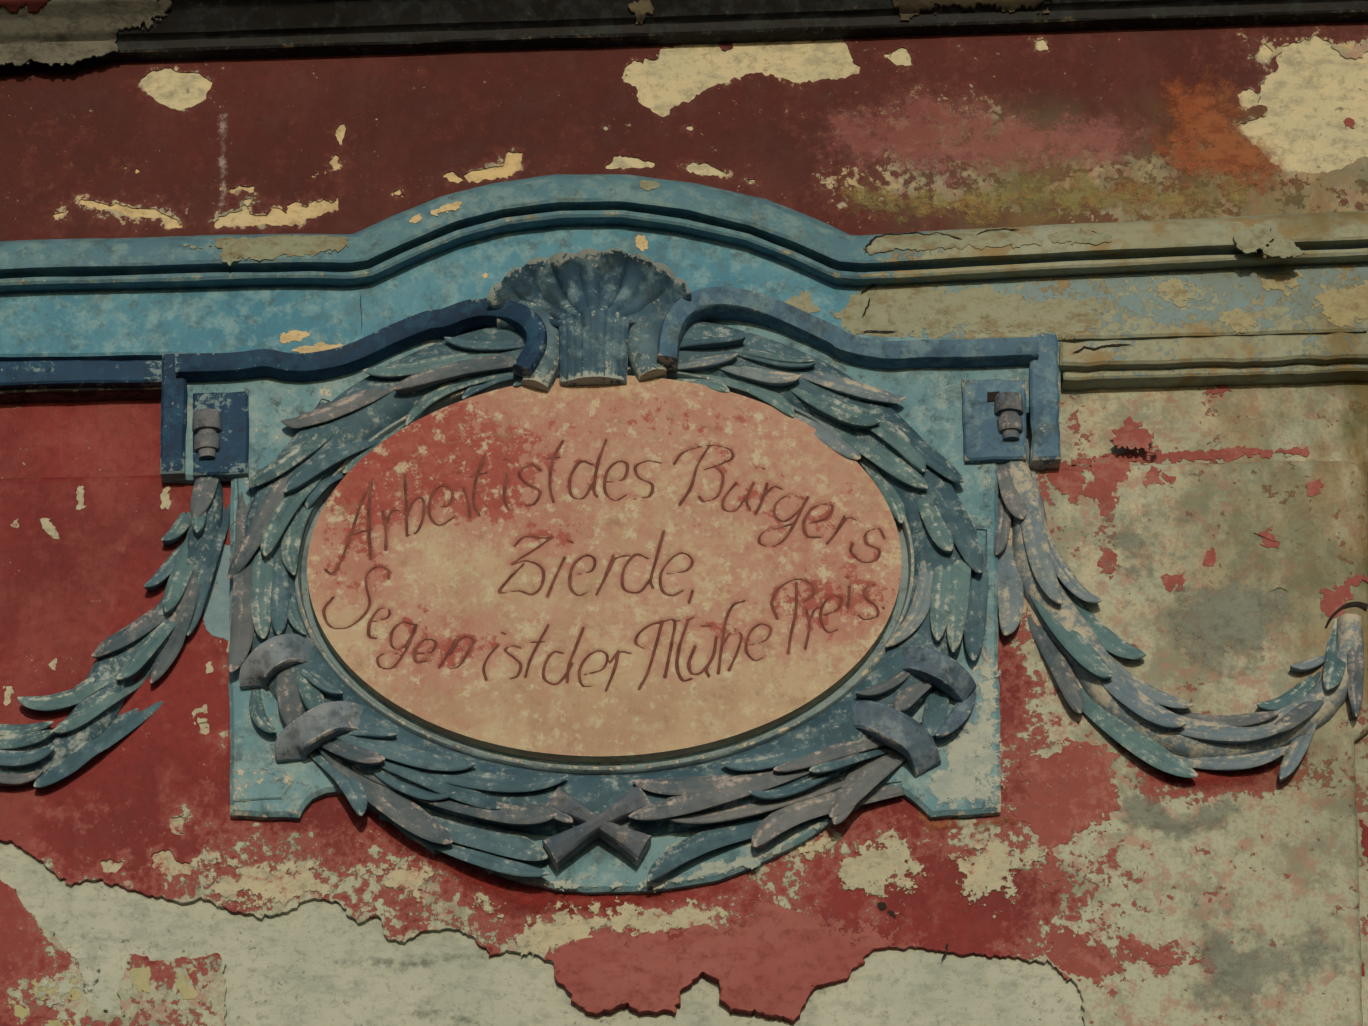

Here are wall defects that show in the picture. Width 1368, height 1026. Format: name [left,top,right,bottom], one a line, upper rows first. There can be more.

peeling [0,0,172,67]
peeling [140,68,213,110]
peeling [628,0,654,25]
peeling [621,40,860,117]
peeling [884,48,911,66]
peeling [1237,35,1368,173]
spalling [53,186,349,267]
peeling [863,229,1112,255]
peeling [1046,453,1176,522]
peeling [1319,574,1368,618]
peeling [797,824,926,918]
spalling [0,833,1217,1026]